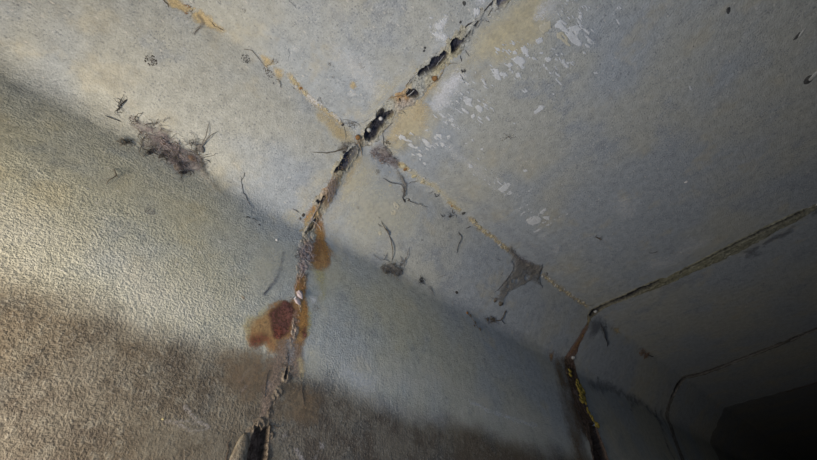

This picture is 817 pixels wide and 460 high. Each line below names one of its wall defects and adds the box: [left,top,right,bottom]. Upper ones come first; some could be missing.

damp [479,0,546,57]
peeling [396,0,595,165]
spalling [364,108,394,142]
spalling [334,146,359,174]
rust [302,206,331,270]
rust [246,275,311,354]
rust [564,326,592,436]